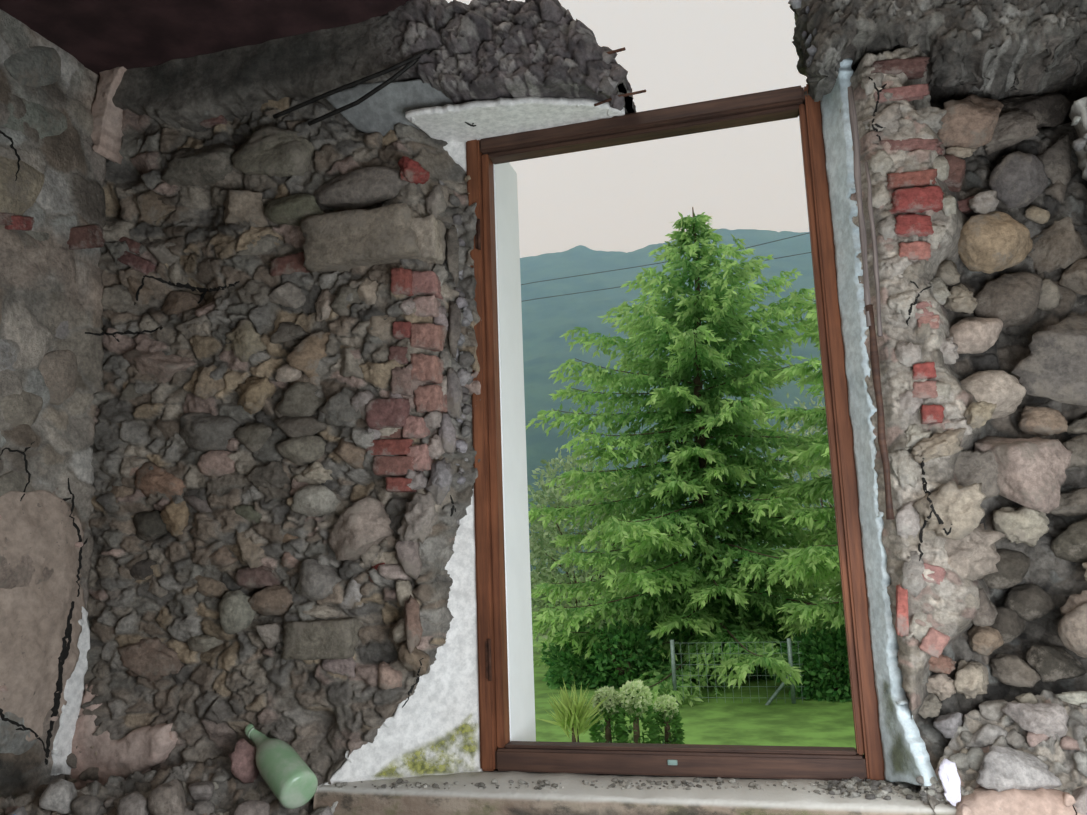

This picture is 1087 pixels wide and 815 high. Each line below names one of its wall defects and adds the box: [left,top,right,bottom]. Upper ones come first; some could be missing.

spalling [1071,104,1087,169]
crack [85,275,240,342]
crack [0,441,35,501]
peeling [324,269,483,785]
peeling [820,58,939,786]
crack [0,478,88,765]
peeling [50,606,178,790]
damp [456,723,473,734]